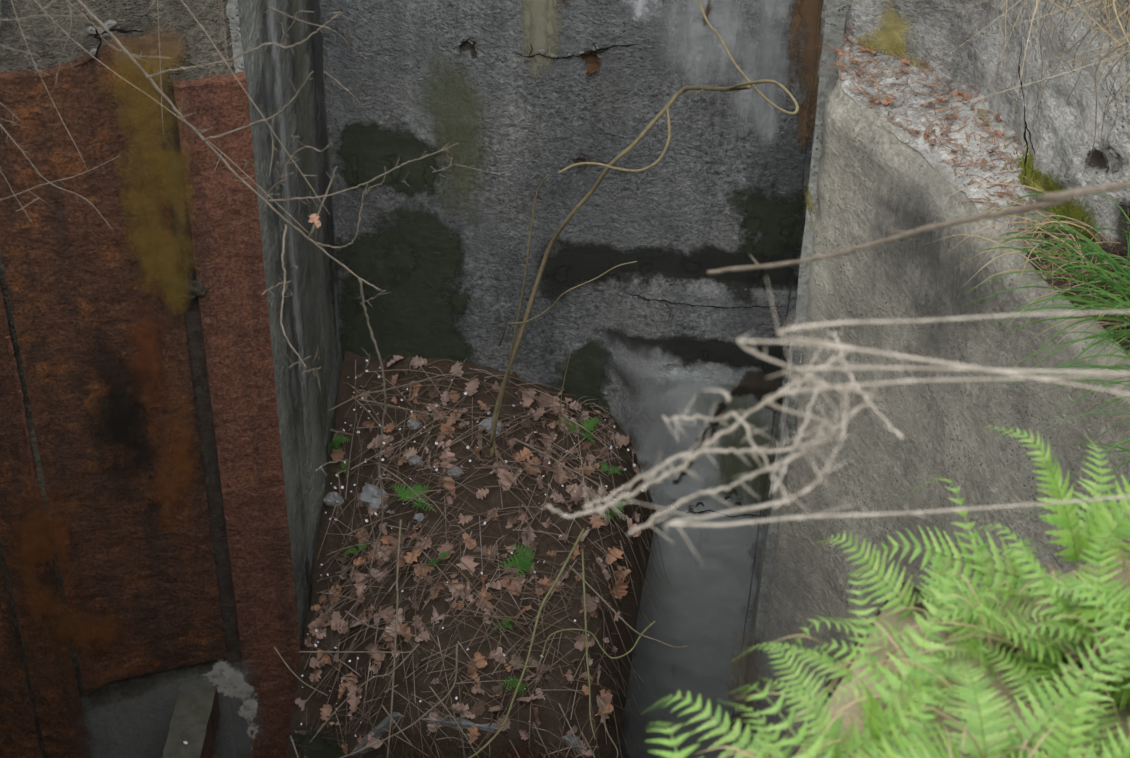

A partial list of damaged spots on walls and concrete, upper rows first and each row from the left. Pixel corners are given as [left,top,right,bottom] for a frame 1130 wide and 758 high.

rust [112,29,190,309]
leakage [422,69,479,200]
crack [515,42,646,59]
leakage [538,0,820,504]
crack [1018,46,1035,193]
crack [659,436,772,618]